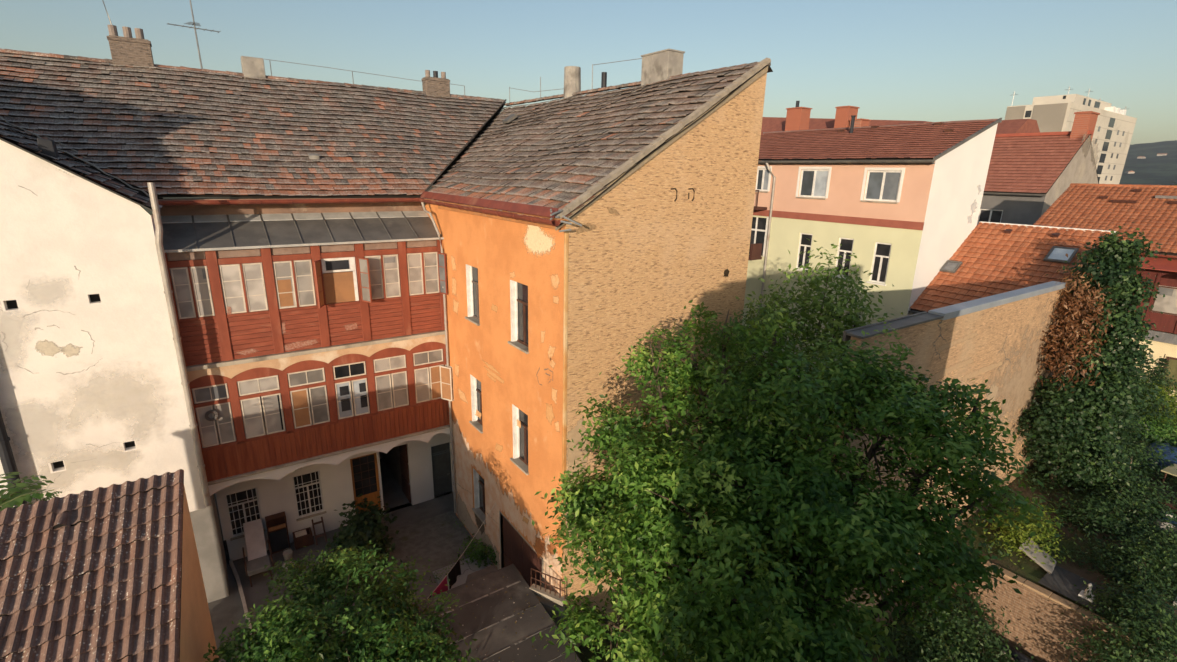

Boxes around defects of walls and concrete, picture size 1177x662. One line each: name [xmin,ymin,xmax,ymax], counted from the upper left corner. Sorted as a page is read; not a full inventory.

flaking render [523,224,555,258]
flaking render [35,340,82,357]
flaking render [452,419,562,596]